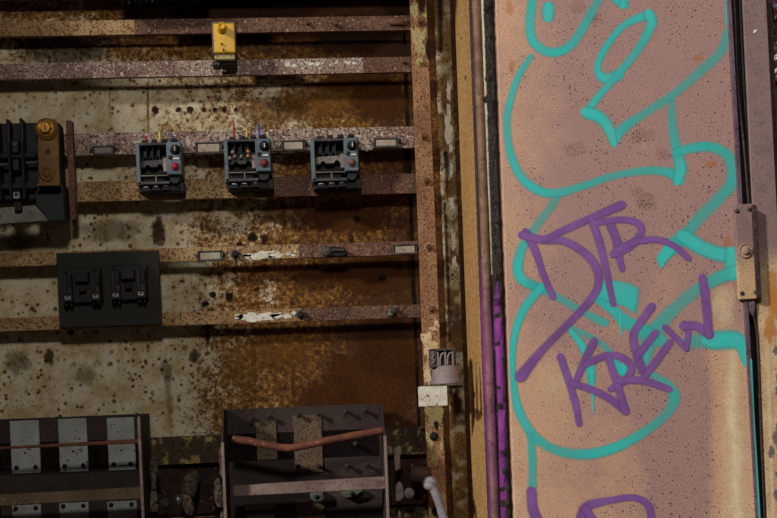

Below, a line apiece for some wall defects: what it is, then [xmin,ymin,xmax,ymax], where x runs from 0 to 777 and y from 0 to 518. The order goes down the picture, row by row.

peeling [410,0,427,56]
corrosion [175,73,410,126]
peeling [242,250,296,260]
peeling [234,311,296,322]
corrosion [765,286,777,340]
peeling [420,318,440,385]